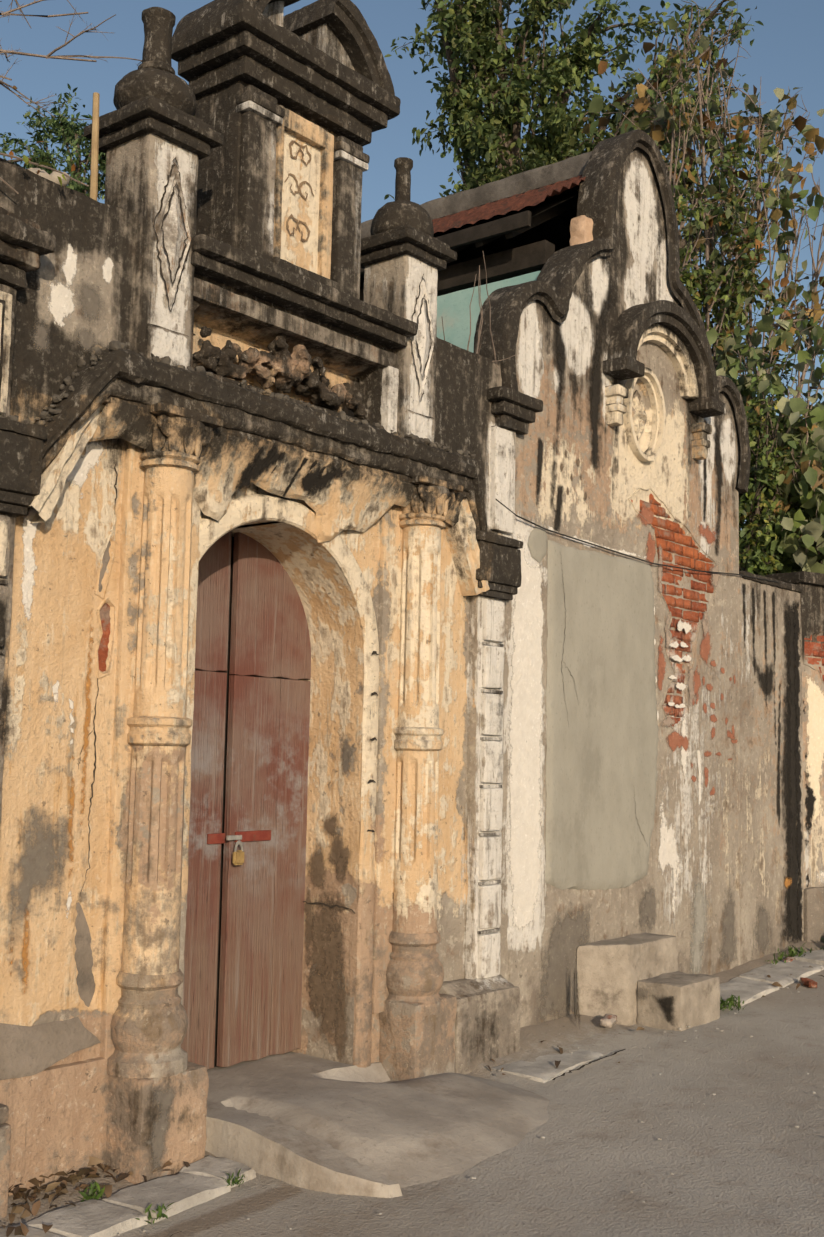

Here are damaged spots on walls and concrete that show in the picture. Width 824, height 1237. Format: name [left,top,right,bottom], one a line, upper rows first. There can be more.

damp [590,285,613,469]
peeling [507,536,544,931]
flaking render [548,487,738,805]
peeling [657,789,683,921]
damp [720,889,736,964]
damp [743,584,816,953]
peeling [803,631,824,820]